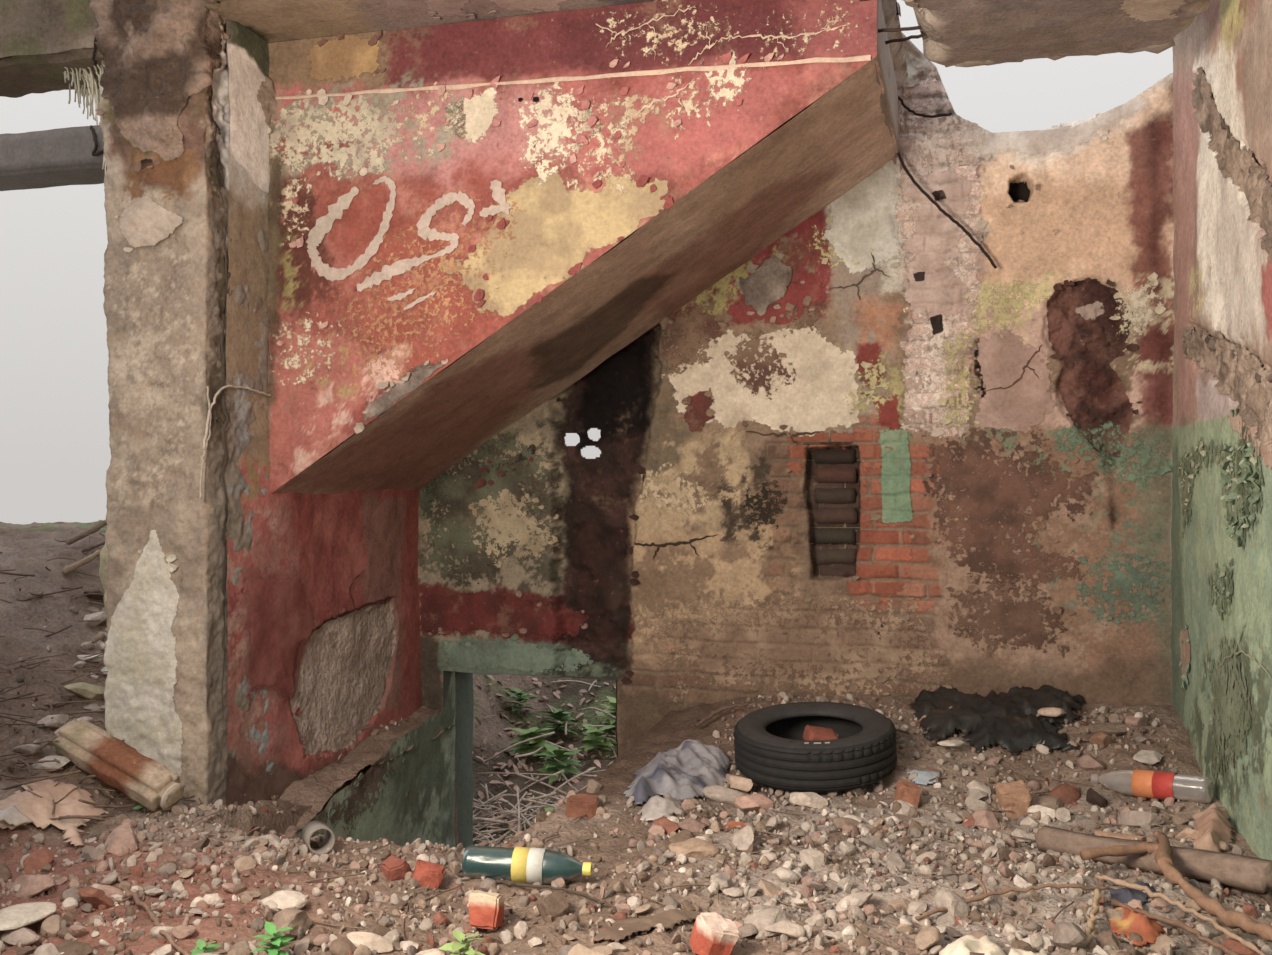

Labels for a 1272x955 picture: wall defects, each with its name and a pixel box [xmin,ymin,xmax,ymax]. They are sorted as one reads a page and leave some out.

peeling [1116,0,1187,22]
peeling [267,0,943,434]
crack [830,253,889,300]
flaking render [656,61,1272,695]
crack [984,345,1042,392]
crack [634,534,717,559]
flaking render [100,530,183,776]
flaking render [290,600,398,759]
damp [1207,633,1251,788]